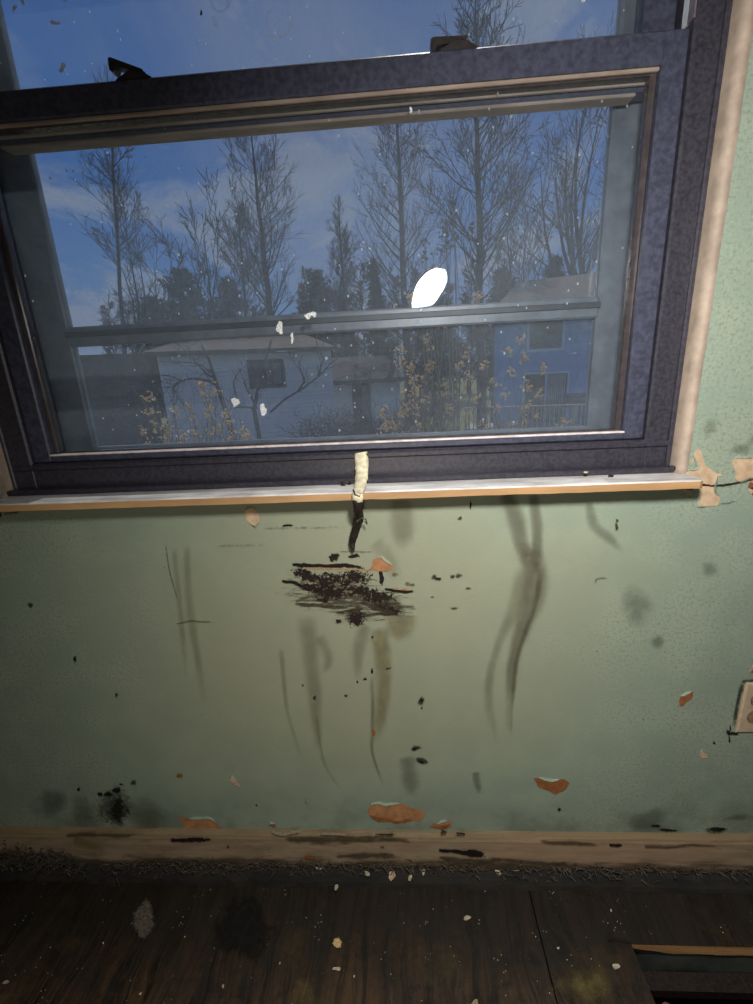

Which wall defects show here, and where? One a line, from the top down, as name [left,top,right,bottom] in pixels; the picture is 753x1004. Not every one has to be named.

peeling [682,449,722,508]
peeling [732,455,753,484]
peeling [679,691,693,706]
peeling [534,777,569,795]
leakage [67,781,136,837]
peeling [368,801,451,830]
leakage [286,835,408,859]
leakage [439,849,567,866]